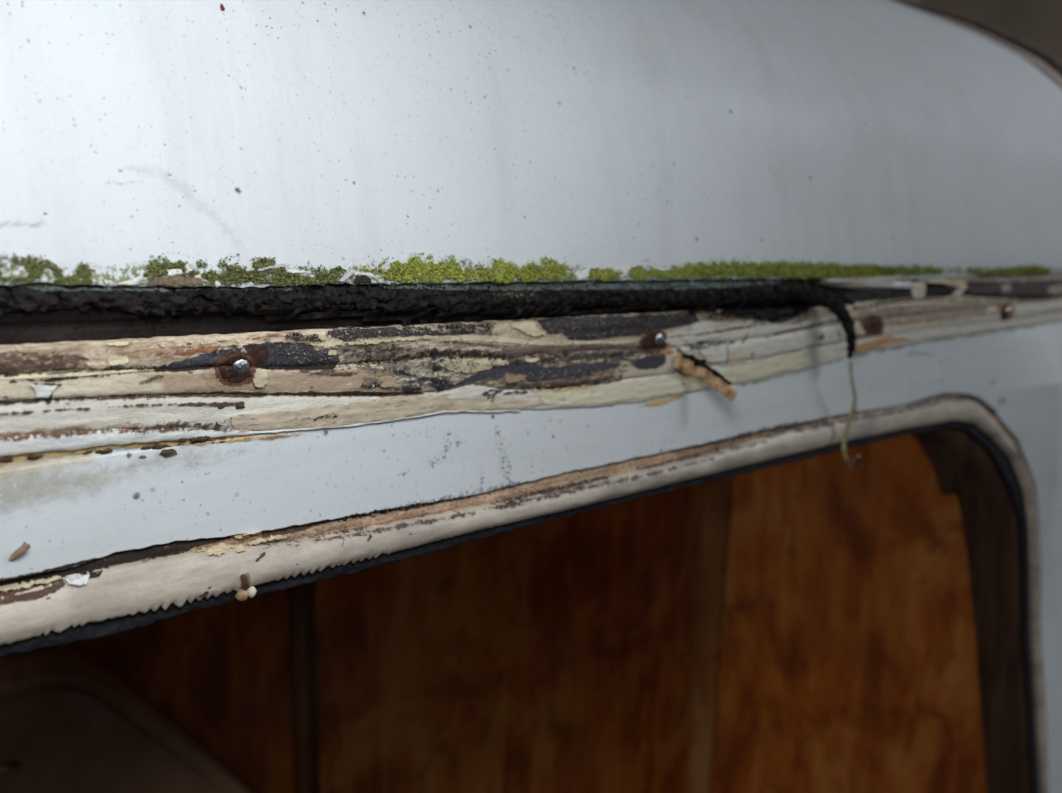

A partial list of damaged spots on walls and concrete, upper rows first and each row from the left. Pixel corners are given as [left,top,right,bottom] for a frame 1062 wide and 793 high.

leakage [17,283,199,293]
leakage [377,280,780,297]
rust [943,301,1062,322]
peeling [0,340,154,380]
rust [105,334,281,392]
peeling [282,321,639,373]
spalling [665,313,846,402]
peeling [252,368,267,387]
peeling [197,531,287,556]
peeling [0,573,90,592]